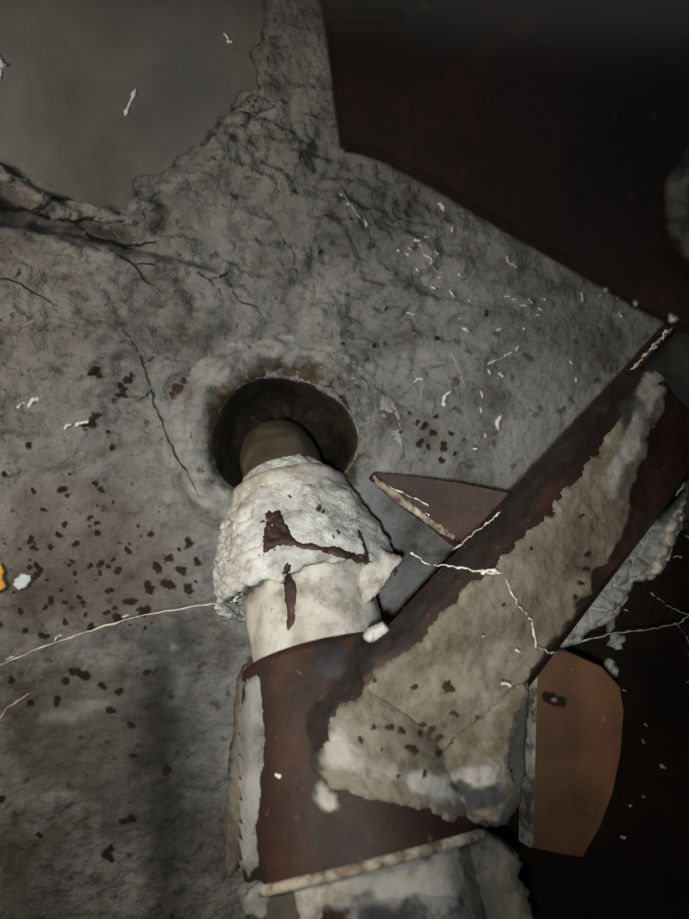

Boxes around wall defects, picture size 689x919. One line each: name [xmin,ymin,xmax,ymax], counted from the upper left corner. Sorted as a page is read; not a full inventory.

spalling [0,0,278,226]
crack [5,196,163,293]
crack [0,268,57,306]
crack [189,264,266,322]
rust [81,412,101,428]
rust [114,372,134,398]
crack [116,321,199,496]
rust [407,411,466,463]
rust [18,521,67,581]
rust [144,536,201,594]
rust [103,598,152,630]
rust [61,668,123,696]